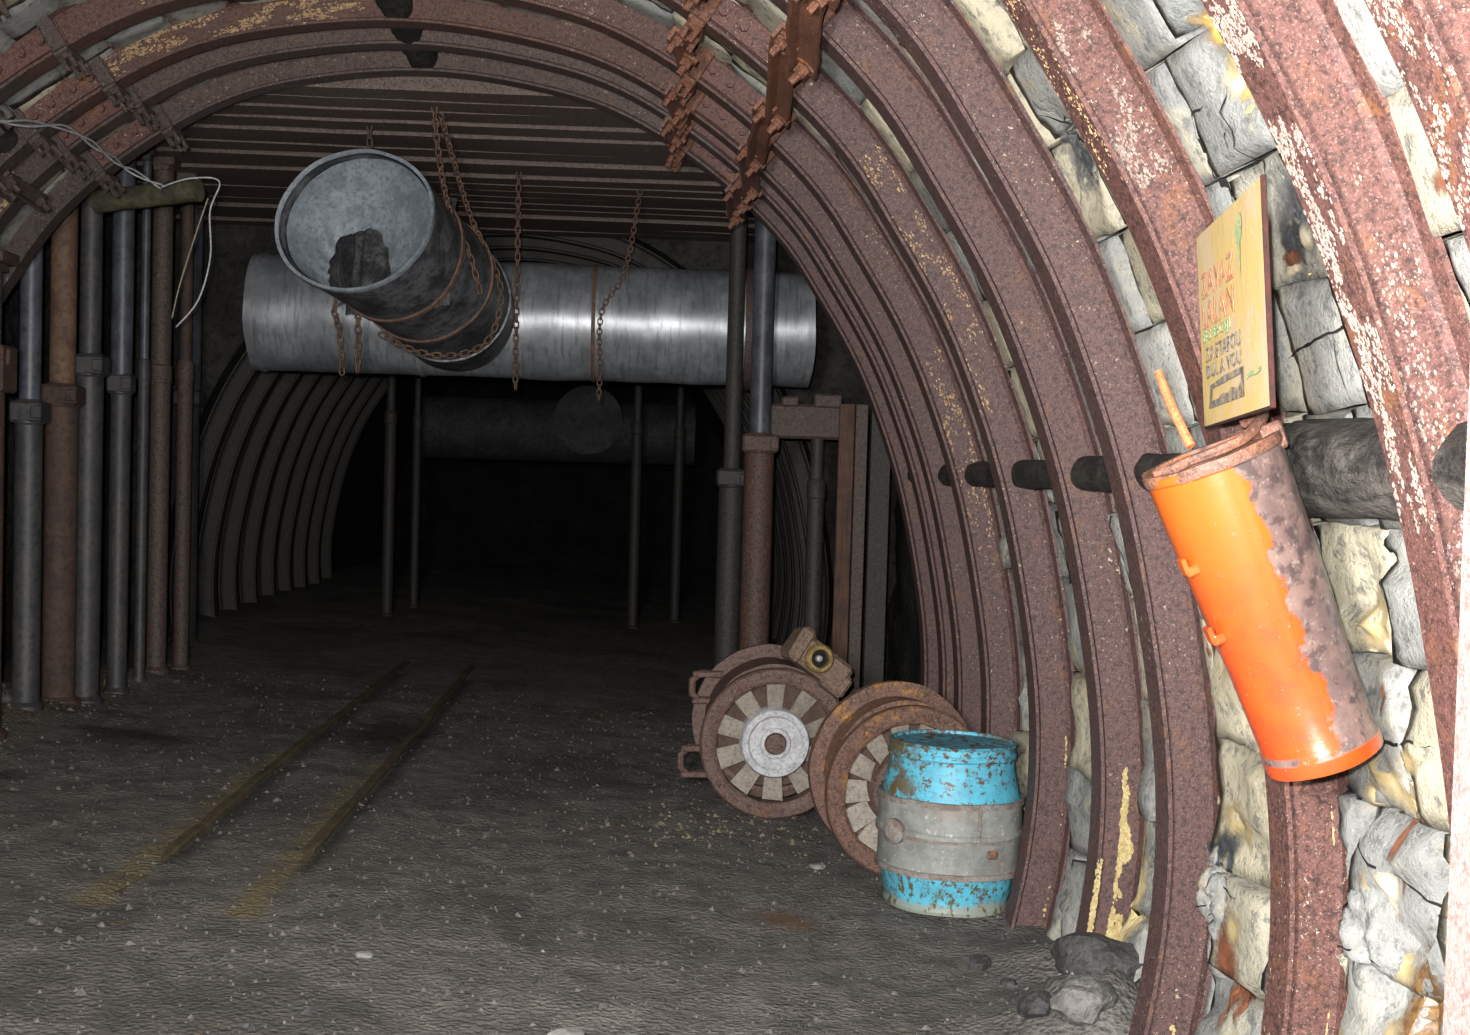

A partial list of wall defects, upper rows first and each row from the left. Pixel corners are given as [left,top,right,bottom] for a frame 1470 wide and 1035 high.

corrosion [1433,171,1446,192]